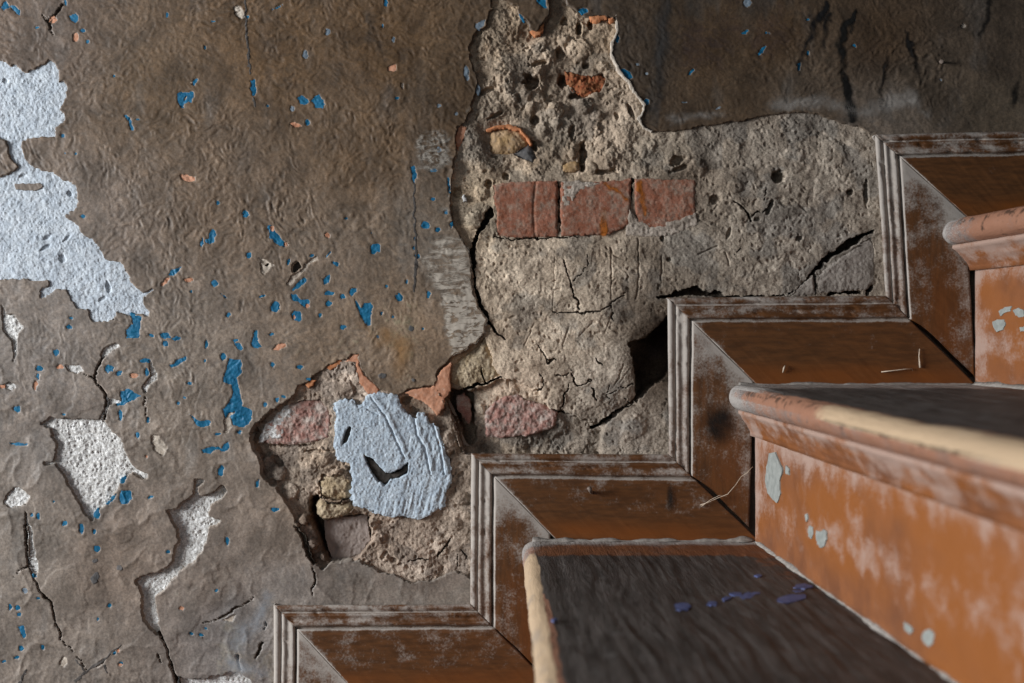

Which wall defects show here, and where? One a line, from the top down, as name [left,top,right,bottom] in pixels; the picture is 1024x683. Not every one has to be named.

peeling [35,0,89,44]
peeling [177,78,198,108]
damp [797,1,857,123]
peeling [0,60,193,584]
spalling [190,0,886,583]
crack [469,182,626,340]
crack [733,190,771,222]
crack [656,230,873,299]
peeling [2,588,40,663]
crack [14,513,121,683]
crack [157,630,181,683]
spalling [137,465,227,636]